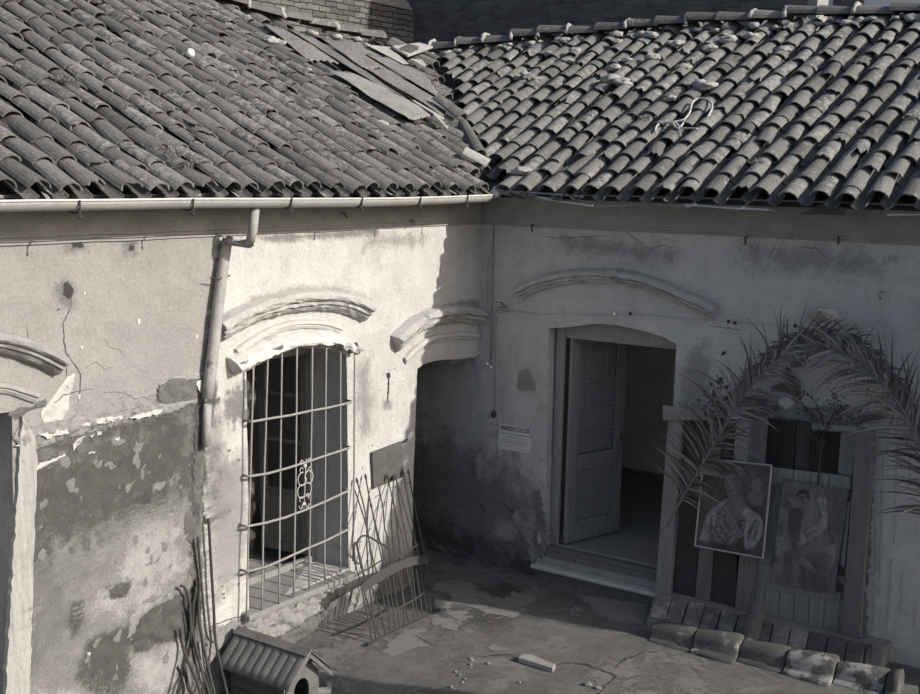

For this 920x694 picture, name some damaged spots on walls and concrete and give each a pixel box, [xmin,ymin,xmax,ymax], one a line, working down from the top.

crack [63,299,148,402]
spalling [9,374,243,694]
water stain [356,439,552,624]
spalling [204,573,382,680]
crack [555,651,651,694]